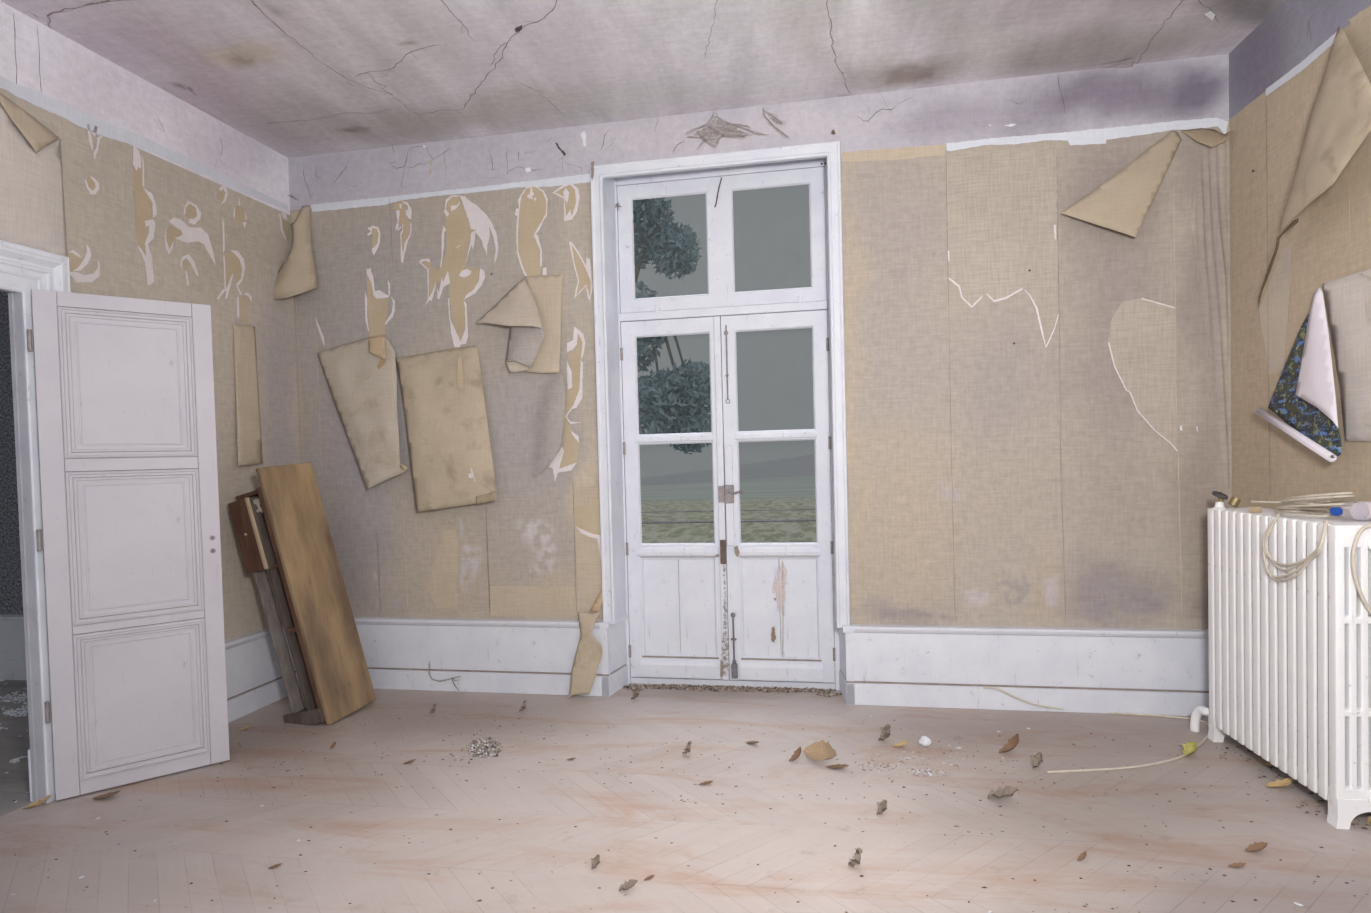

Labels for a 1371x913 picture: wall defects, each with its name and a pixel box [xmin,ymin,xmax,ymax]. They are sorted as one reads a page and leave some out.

crack [13,0,123,94]
crack [252,0,557,187]
crack [481,85,616,174]
peeling [581,131,594,180]
crack [826,0,912,130]
crack [1136,0,1218,95]
peeling [68,253,82,271]
peeling [133,167,153,255]
peeling [367,275,388,337]
peeling [421,196,480,341]
peeling [518,167,576,276]
peeling [559,334,582,469]